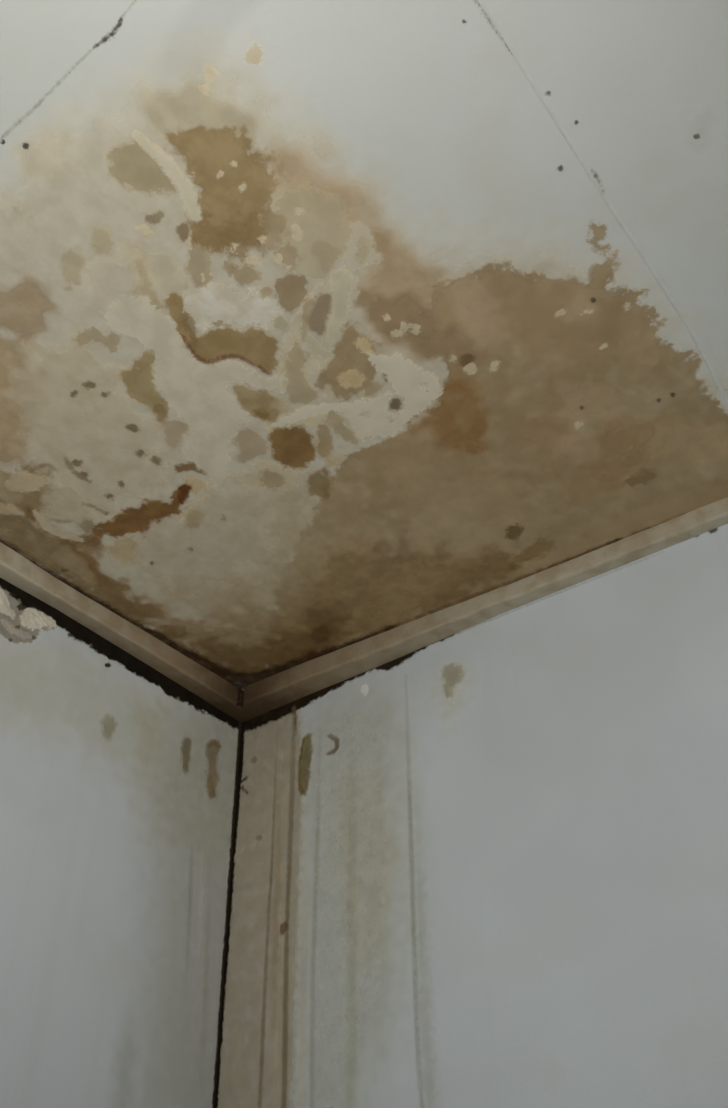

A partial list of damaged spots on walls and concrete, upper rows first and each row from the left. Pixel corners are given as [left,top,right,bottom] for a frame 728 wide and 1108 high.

crack [94,18,123,47]
peeling [4,134,443,589]
peeling [450,354,476,375]
damp [0,99,728,688]
crack [548,538,622,569]
spalling [0,586,57,643]
damp [217,712,301,1108]